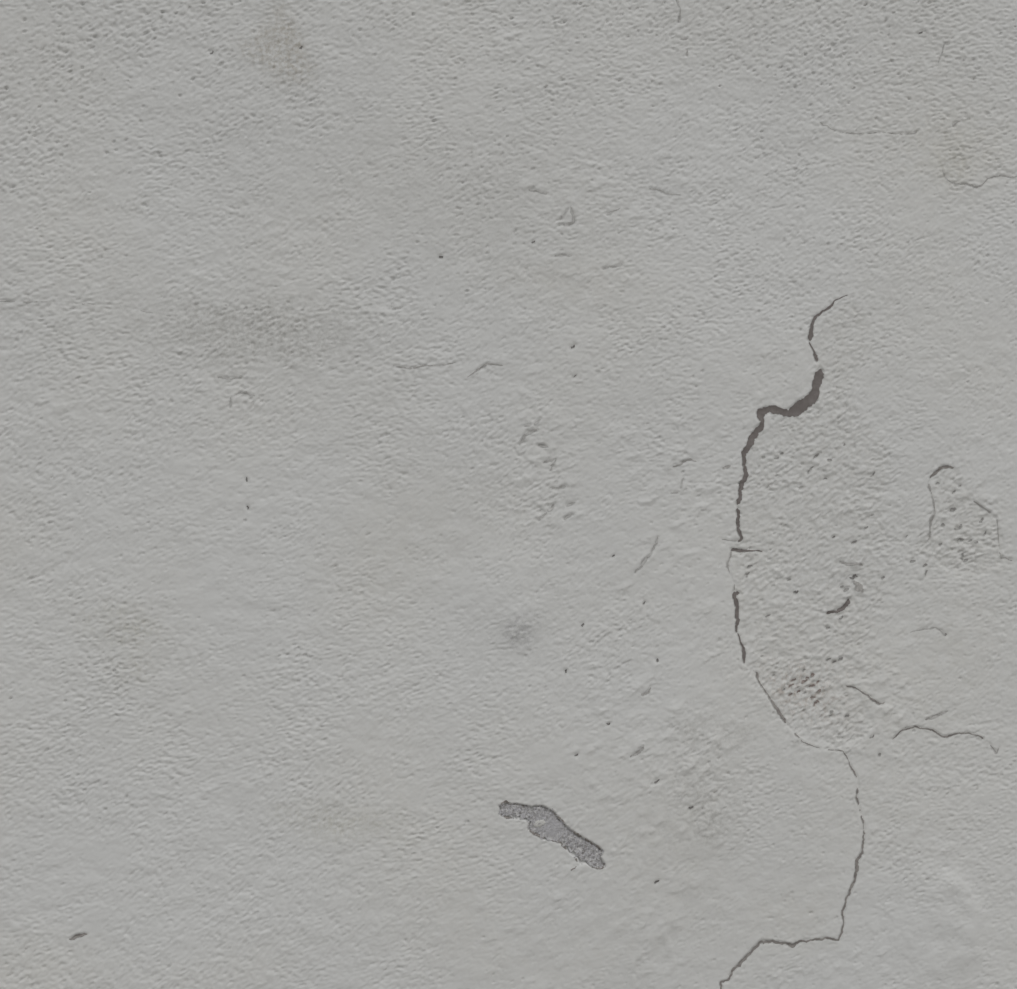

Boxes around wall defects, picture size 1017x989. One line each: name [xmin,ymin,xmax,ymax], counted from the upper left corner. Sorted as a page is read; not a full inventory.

crack [671,458,697,494]
crack [720,295,865,989]
spalling [498,800,606,871]